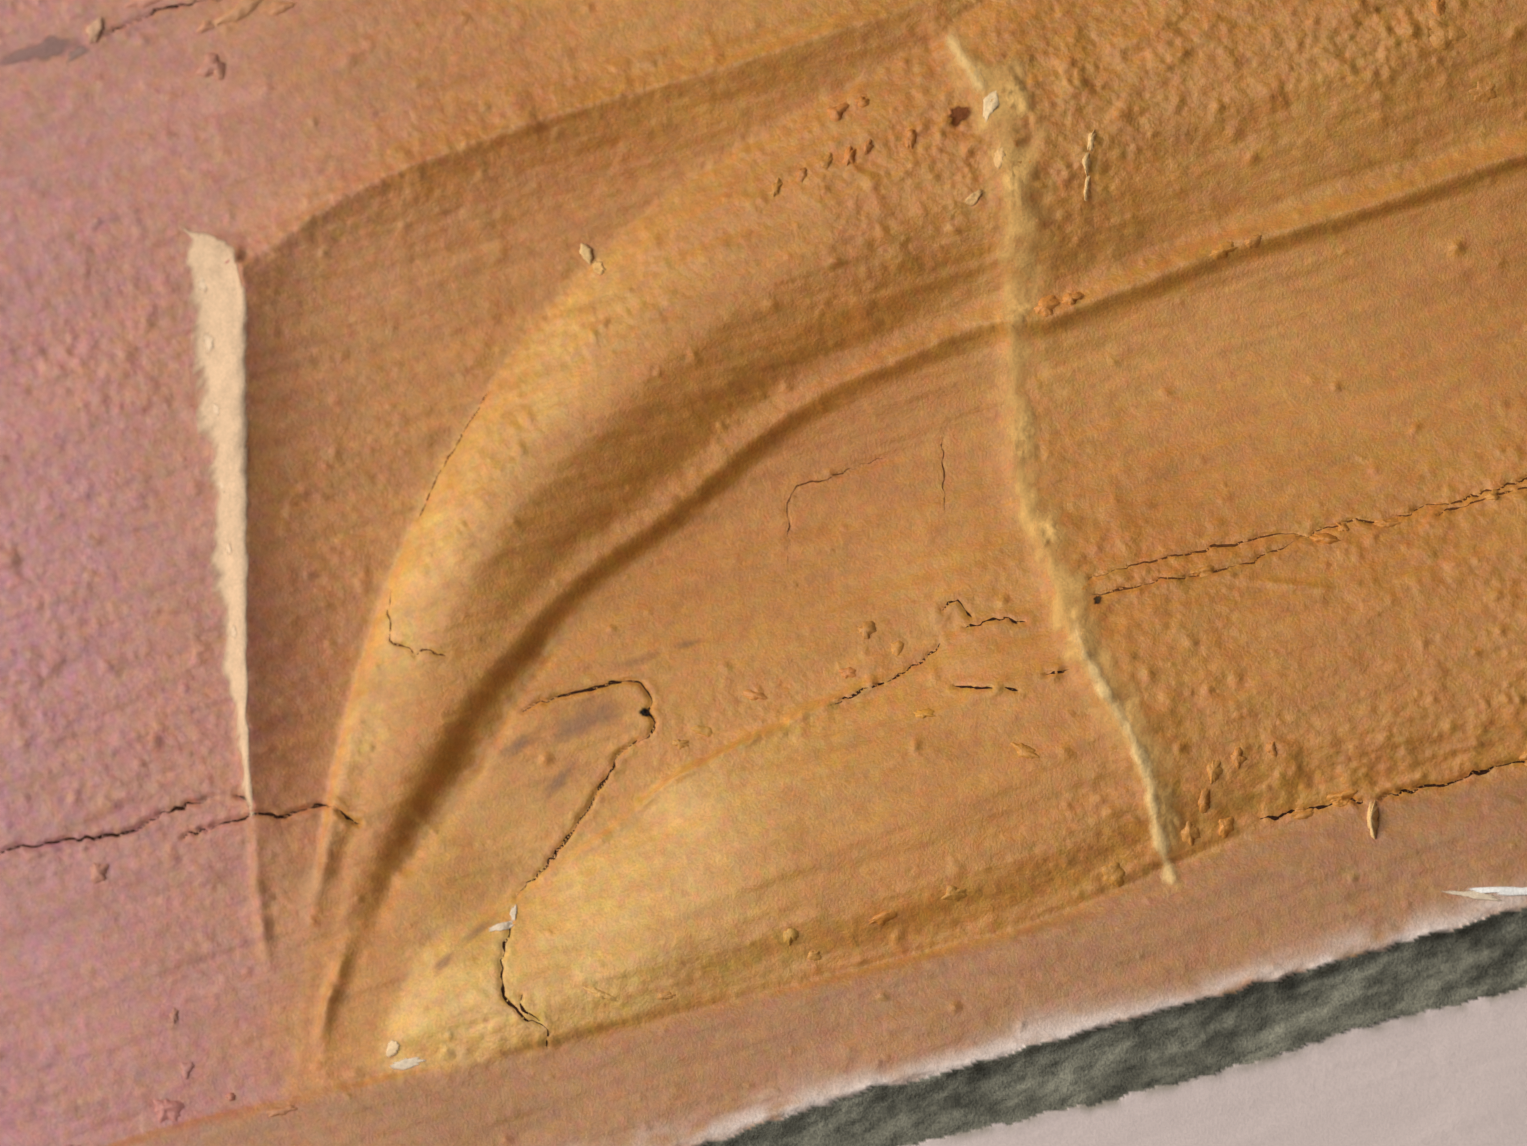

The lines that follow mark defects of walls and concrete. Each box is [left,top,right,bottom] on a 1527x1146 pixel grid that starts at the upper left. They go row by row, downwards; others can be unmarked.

crack [105,0,220,35]
crack [1085,477,1527,596]
crack [836,600,1025,704]
crack [955,669,1069,691]
crack [1260,761,1525,821]
crack [0,795,358,853]
crack [500,680,656,1047]